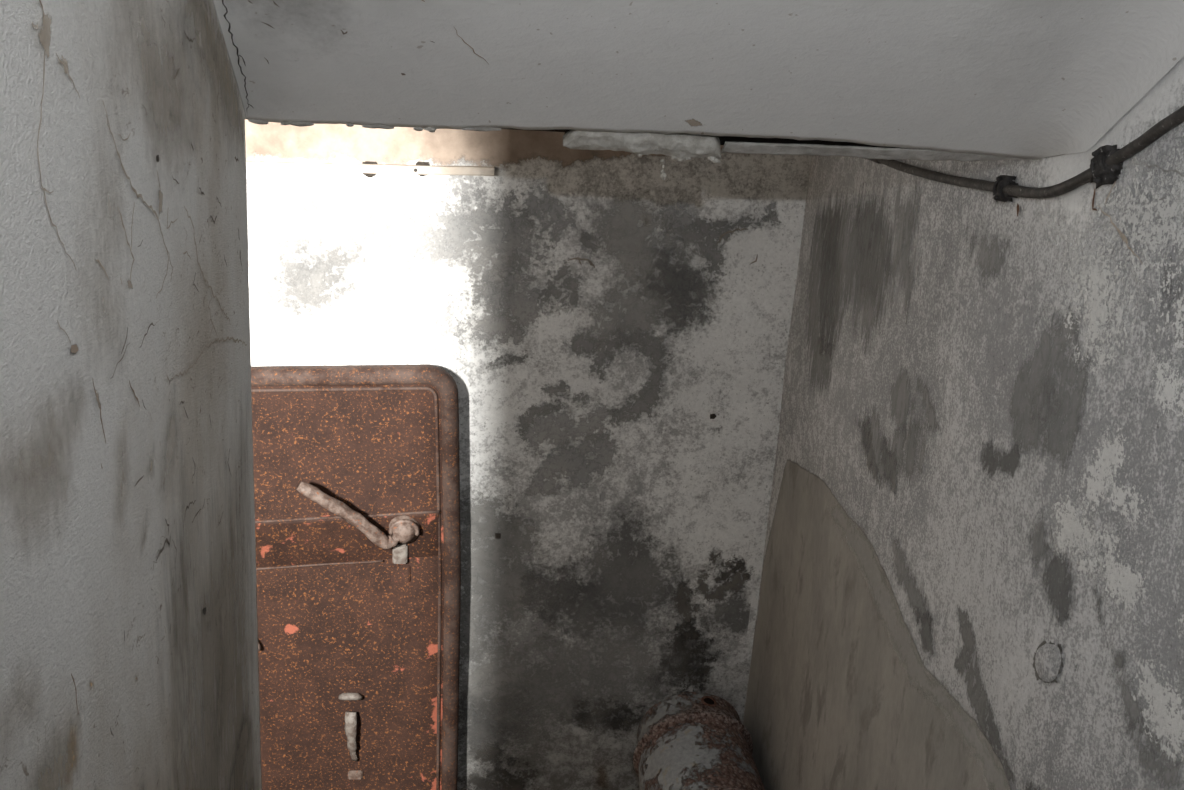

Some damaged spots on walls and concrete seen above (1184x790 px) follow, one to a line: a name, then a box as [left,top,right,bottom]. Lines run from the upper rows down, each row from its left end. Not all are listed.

crack [222,0,252,115]
flaking render [563,119,1037,163]
crack [32,0,245,469]
leakage [582,188,721,352]
leakage [807,183,920,393]
leakage [858,370,939,495]
leakage [981,313,1088,477]
leakage [458,487,753,790]